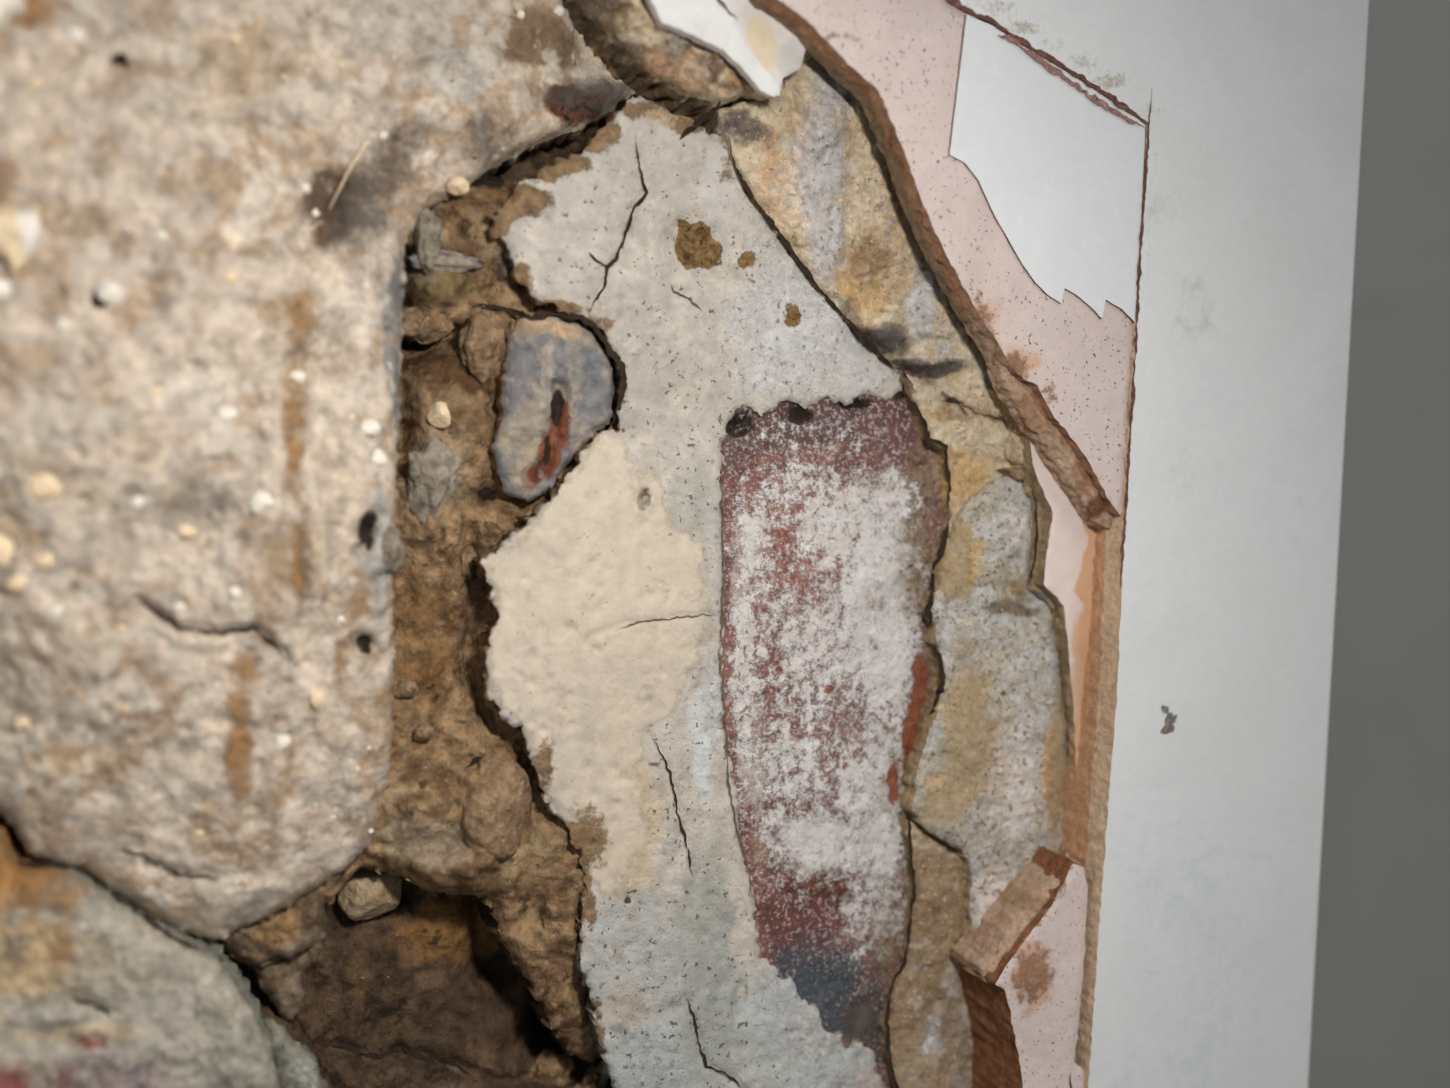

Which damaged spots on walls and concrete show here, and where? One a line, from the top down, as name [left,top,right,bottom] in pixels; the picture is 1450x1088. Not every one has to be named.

peeling [721,0,806,99]
crack [401,332,451,352]
crack [472,136,648,425]
crack [670,283,700,309]
spalling [675,219,756,270]
spalling [784,303,803,327]
crack [680,101,1039,714]
spalling [986,352,1113,530]
crack [138,600,287,660]
peeling [836,563,929,755]
spalling [952,863,1065,1004]
crack [687,999,741,1087]